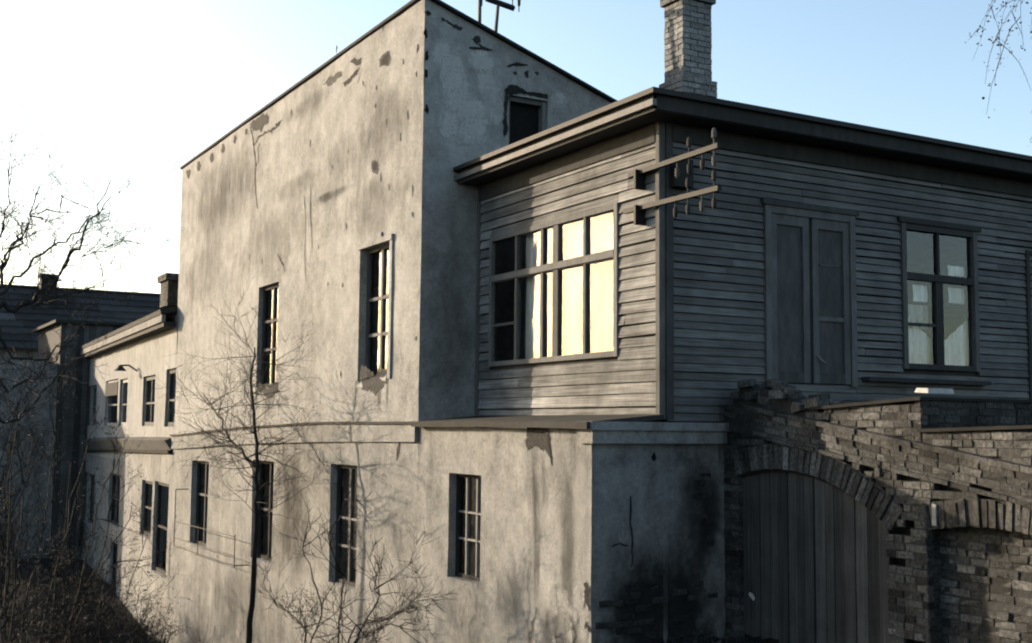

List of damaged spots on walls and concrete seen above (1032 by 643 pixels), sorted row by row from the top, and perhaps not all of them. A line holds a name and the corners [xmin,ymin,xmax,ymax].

flaking render [323,58,377,109]
flaking render [379,50,404,68]
flaking render [415,10,566,146]
flaking render [186,109,292,179]
crack [250,120,282,209]
flaking render [358,365,392,396]
flaking render [525,428,553,465]
crack [612,496,634,573]
flaking render [528,569,718,643]